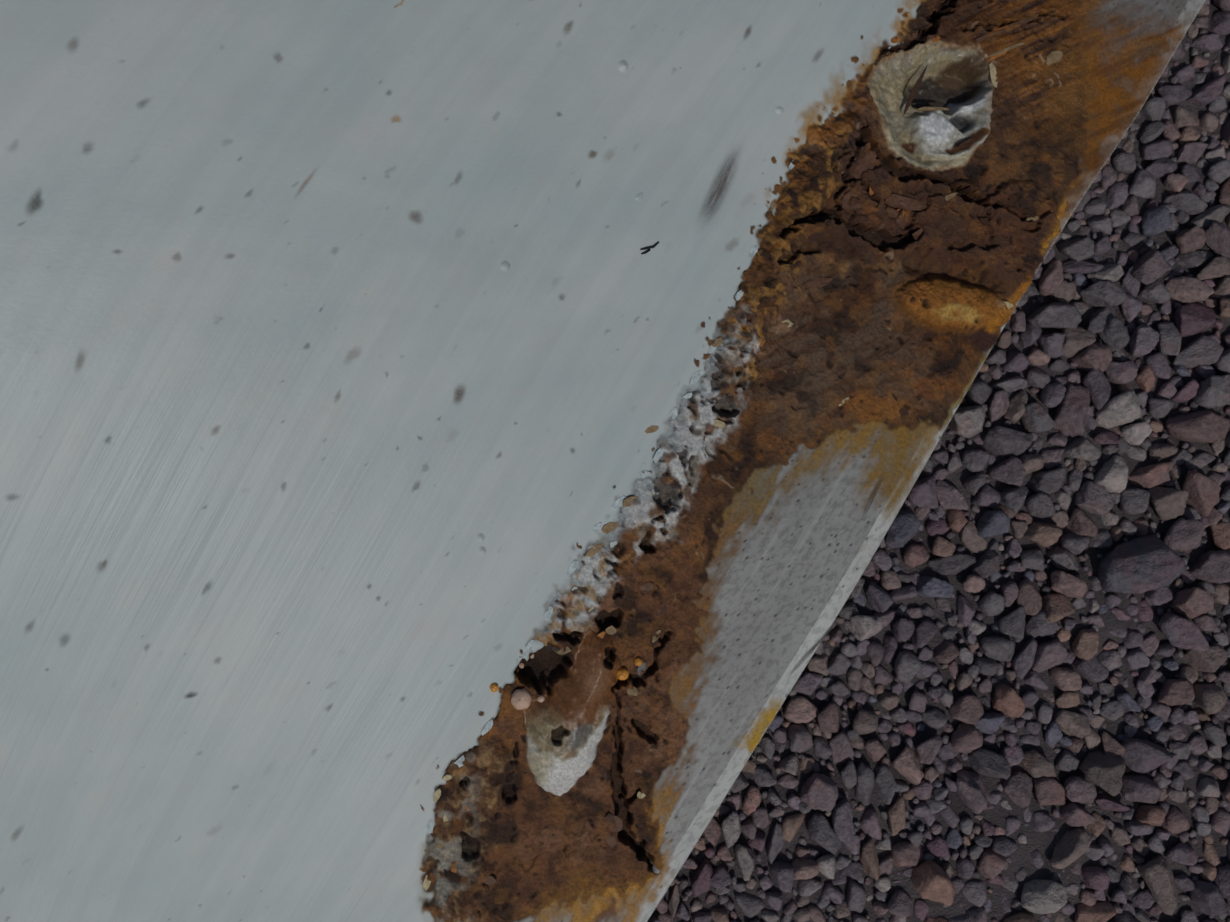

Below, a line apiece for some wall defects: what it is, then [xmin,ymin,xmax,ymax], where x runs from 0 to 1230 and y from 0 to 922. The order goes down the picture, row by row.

crack [777,128,1033,265]
spalling [866,40,998,172]
crack [874,0,1066,66]
peeling [534,306,762,655]
corrosion [419,0,1185,922]
crack [611,631,674,879]